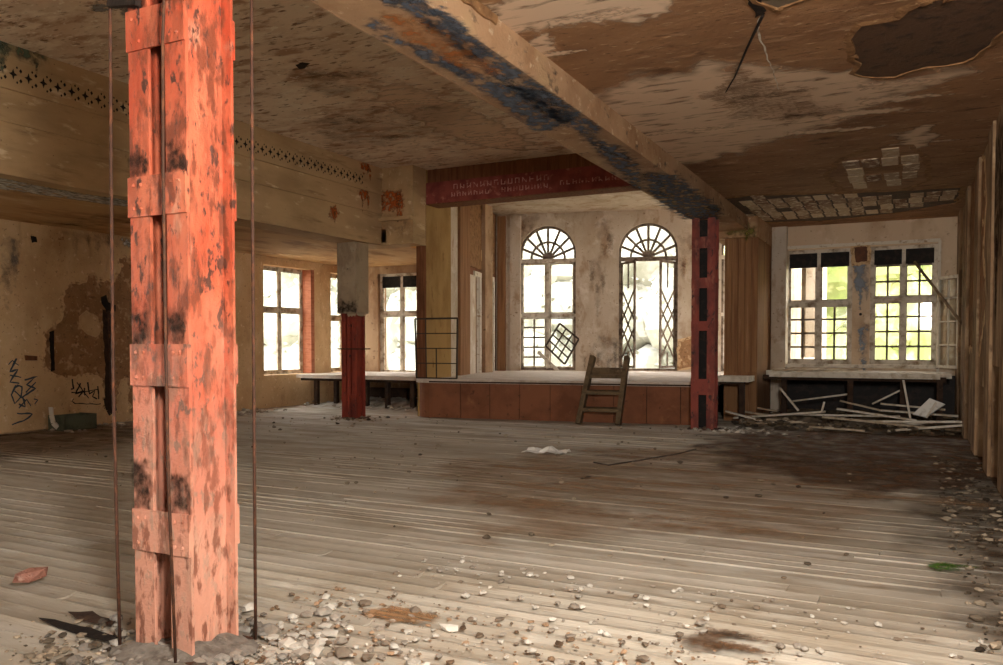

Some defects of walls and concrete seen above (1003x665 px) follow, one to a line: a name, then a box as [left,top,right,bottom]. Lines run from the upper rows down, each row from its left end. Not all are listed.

crack [725,0,779,93]
flaking render [366,0,1003,371]
flaking render [40,238,133,433]